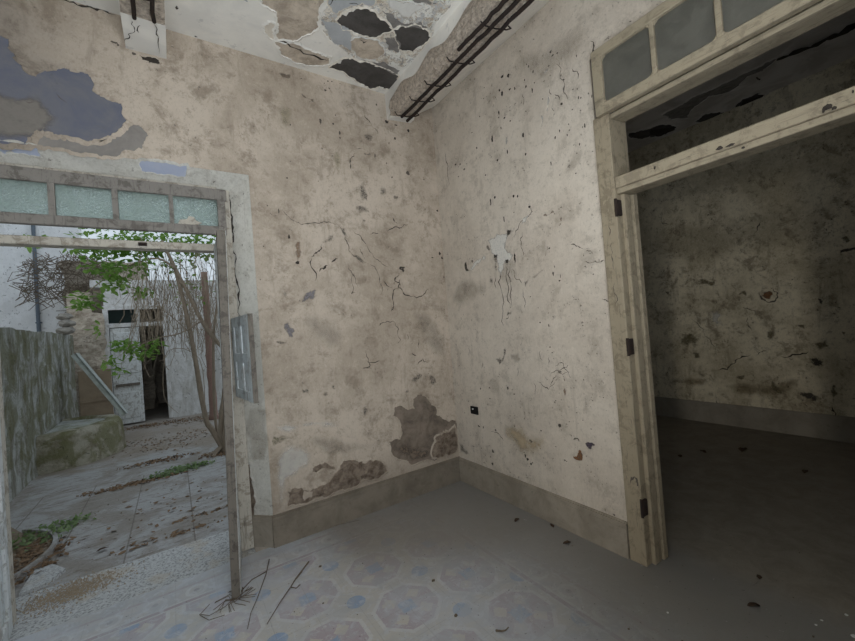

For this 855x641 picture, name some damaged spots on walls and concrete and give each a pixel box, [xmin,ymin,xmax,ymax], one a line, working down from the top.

spalling [119,0,165,25]
peeling [0,30,191,180]
spalling [245,0,534,132]
crack [279,211,428,363]
crack [494,236,526,319]
flaking render [284,457,389,509]
flaking render [430,424,459,460]